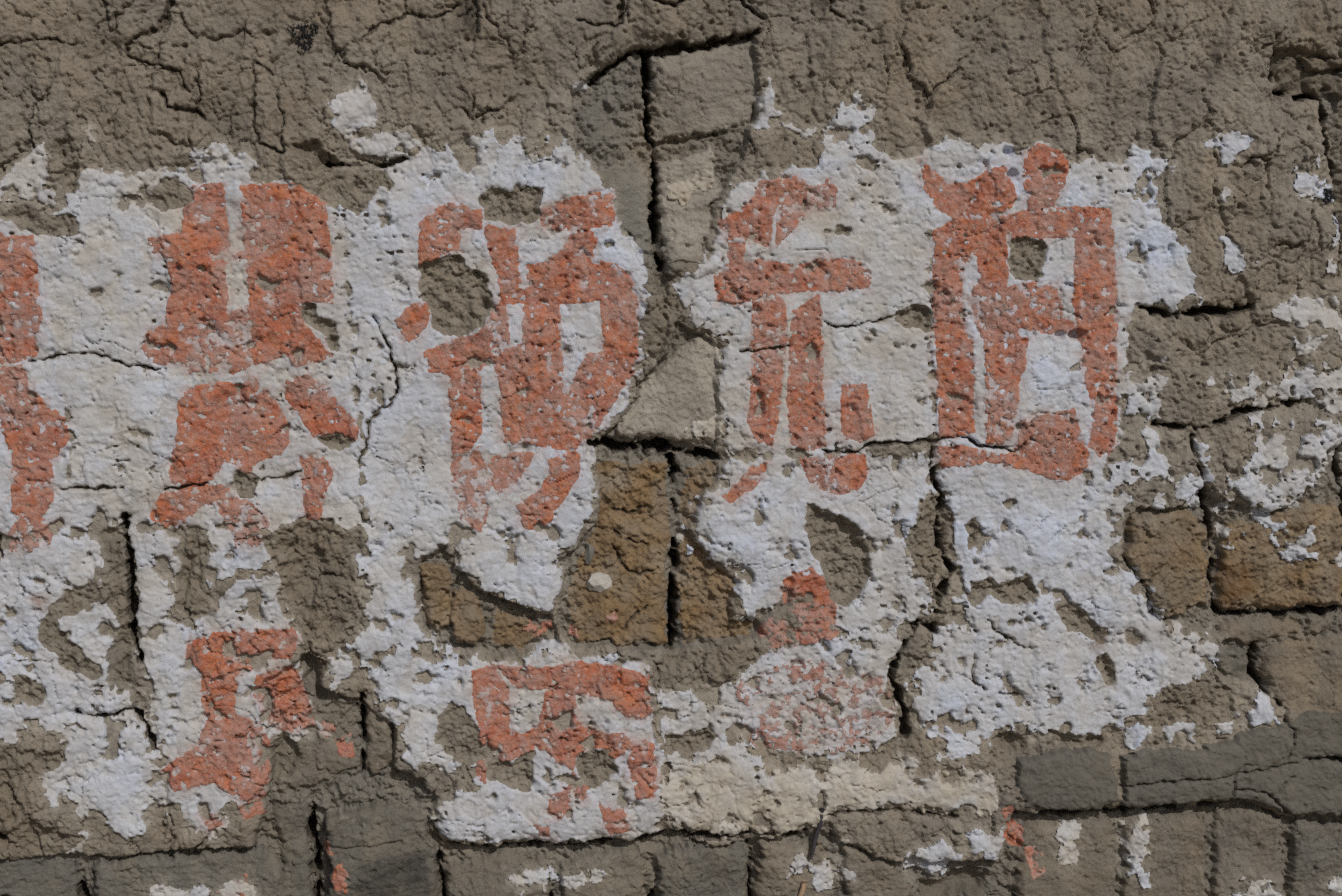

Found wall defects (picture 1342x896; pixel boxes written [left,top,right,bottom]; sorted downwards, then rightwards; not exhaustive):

crack [368,0,460,35]
crack [575,0,686,28]
crack [739,0,766,20]
crack [0,37,77,47]
crack [124,0,206,121]
crack [251,58,286,154]
spalling [285,138,339,172]
peeling [1204,131,1254,167]
peeling [1219,186,1231,203]
peeling [1218,236,1259,275]
peeling [1270,295,1342,343]
peeling [550,297,618,401]